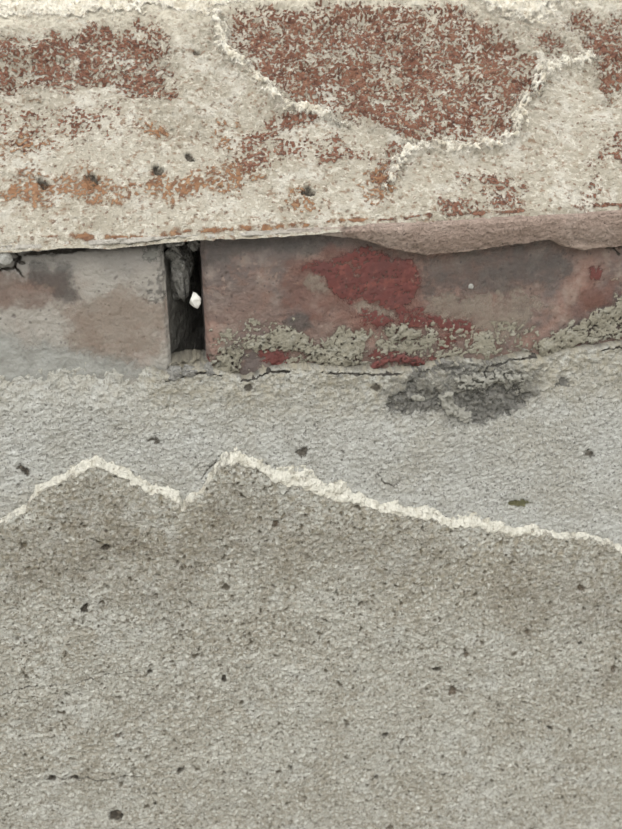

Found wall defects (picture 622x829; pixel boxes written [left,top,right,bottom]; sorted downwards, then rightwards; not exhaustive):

peeling [0,15,179,154]
peeling [226,0,622,191]
crack [0,248,90,276]
peeling [189,292,201,309]
flaking render [207,245,622,425]
crack [165,367,290,382]
crack [322,369,401,377]
crack [467,353,537,378]
flaking render [0,446,622,554]